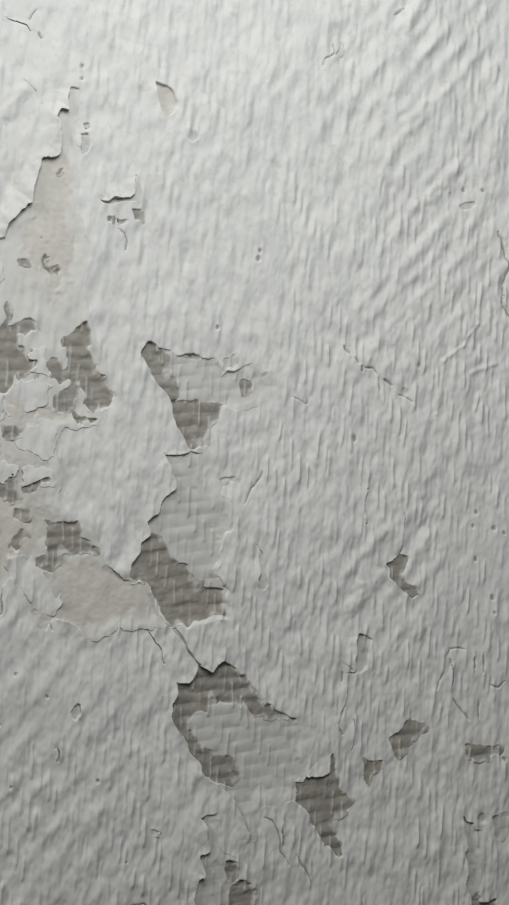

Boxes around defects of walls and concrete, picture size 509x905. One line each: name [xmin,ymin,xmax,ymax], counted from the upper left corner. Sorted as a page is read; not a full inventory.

peeling [0,64,355,905]
peeling [379,554,420,599]
peeling [363,757,383,787]
peeling [389,718,429,760]
peeling [465,743,506,763]
peeling [449,811,509,905]